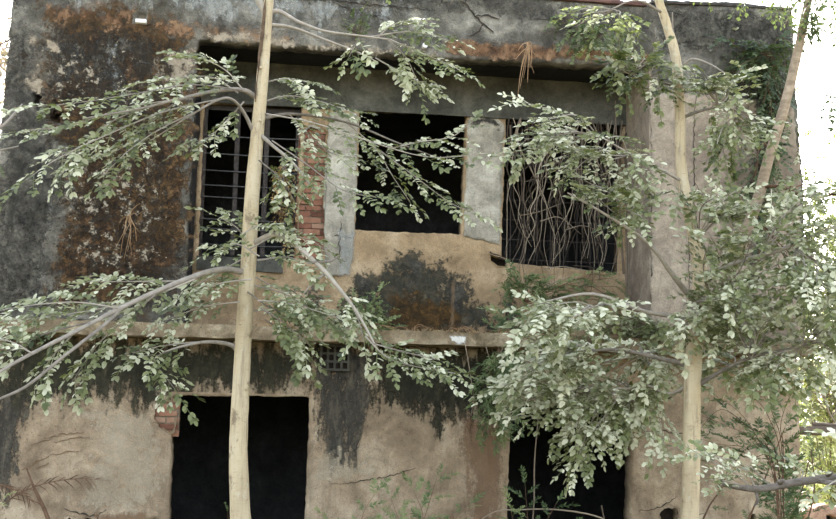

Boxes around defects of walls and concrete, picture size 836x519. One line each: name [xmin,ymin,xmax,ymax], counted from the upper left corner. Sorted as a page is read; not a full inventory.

damp [495,2,650,30]
damp [201,31,260,42]
damp [271,37,296,49]
damp [0,21,199,319]
flaking render [294,124,327,265]
damp [335,230,497,344]
damp [499,292,516,330]
flaking render [151,398,181,436]
damp [311,345,379,476]
damp [0,384,29,507]
crack [331,468,415,484]
spalling [656,505,680,519]